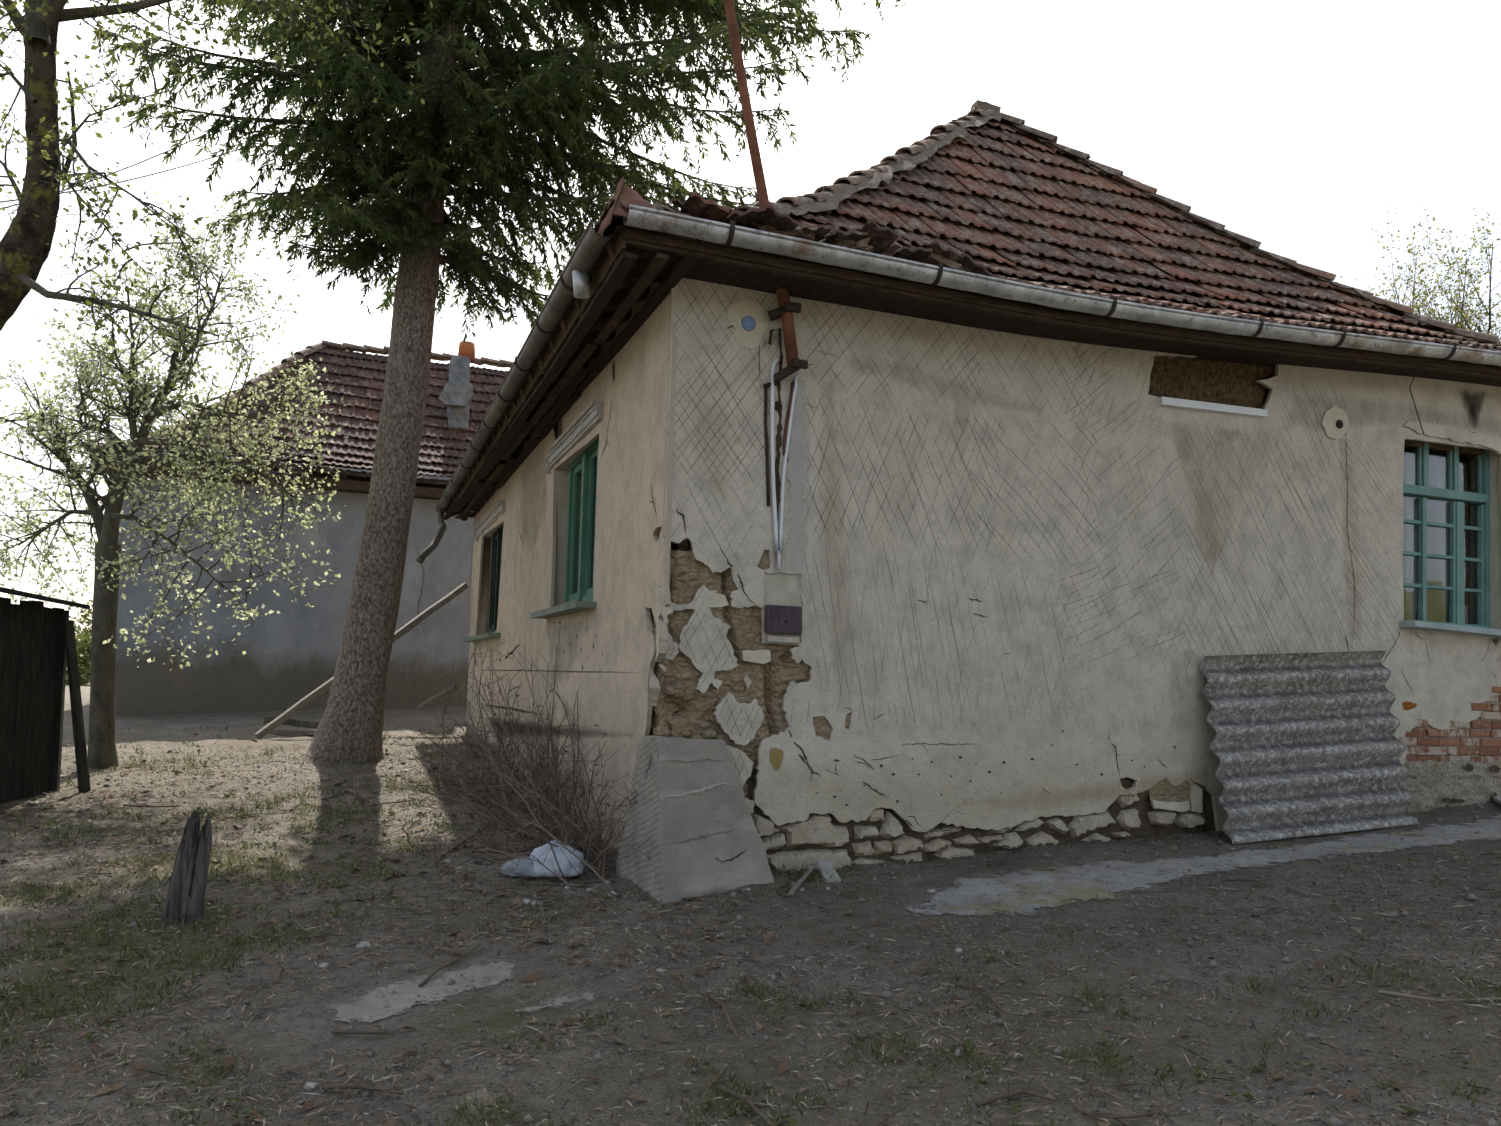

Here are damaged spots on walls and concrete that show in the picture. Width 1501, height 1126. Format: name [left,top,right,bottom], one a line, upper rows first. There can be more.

spalling [644,509,810,813]
flaking render [1396,686,1501,773]